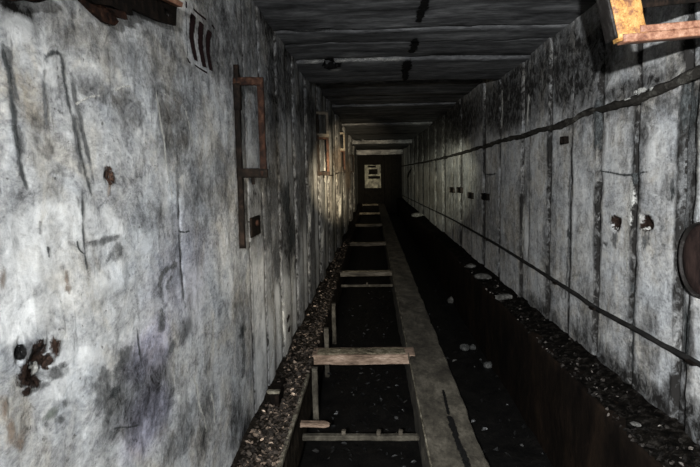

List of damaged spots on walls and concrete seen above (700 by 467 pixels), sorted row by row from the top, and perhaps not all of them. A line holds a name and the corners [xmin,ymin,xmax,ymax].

water stain [2,43,27,189]
water stain [45,50,99,193]
rust [104,166,115,193]
flaking render [603,180,654,274]
water stain [85,346,131,421]